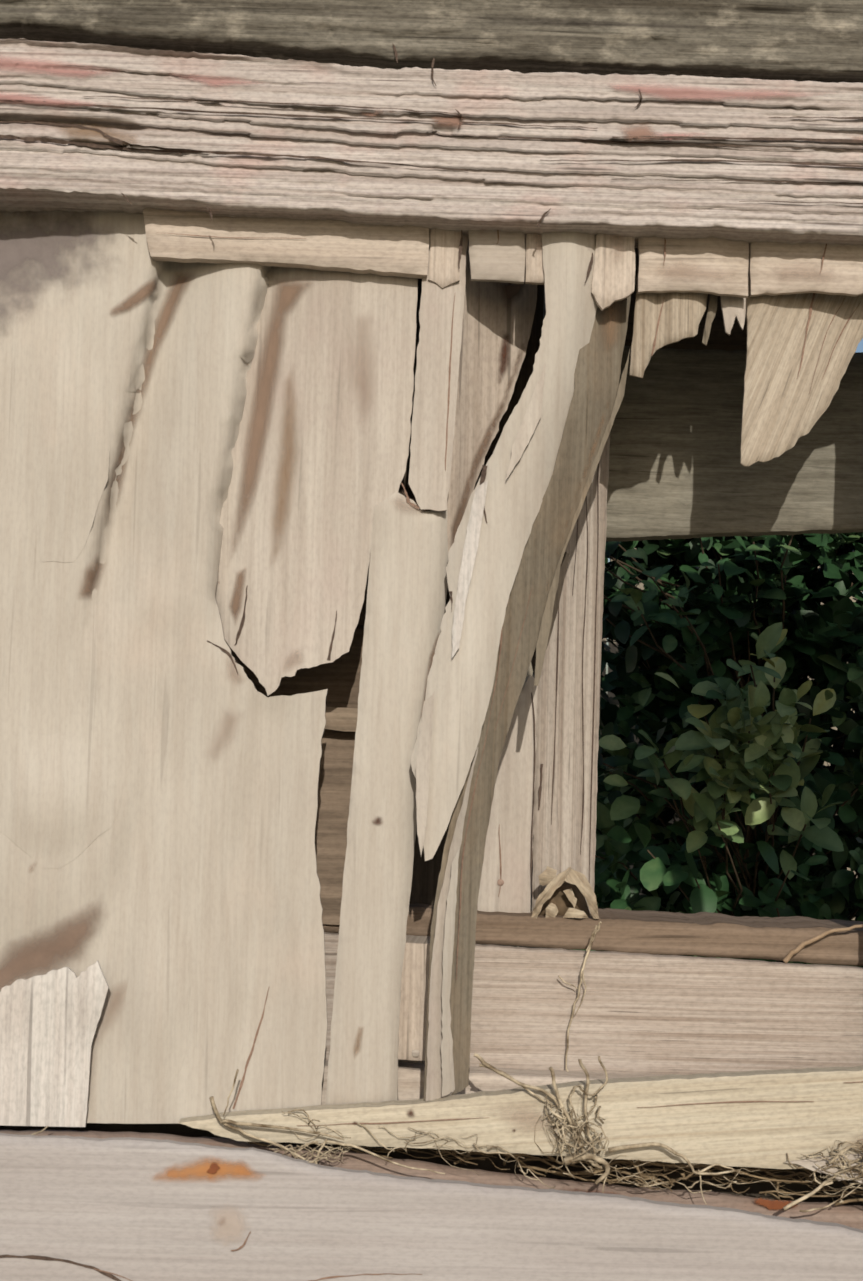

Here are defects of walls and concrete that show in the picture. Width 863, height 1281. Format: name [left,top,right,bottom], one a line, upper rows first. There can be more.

peeling [452,480,488,658]
peeling [415,691,435,855]
corrosion [165,1161,253,1179]
crack [0,1255,132,1281]
crack [309,1273,422,1281]